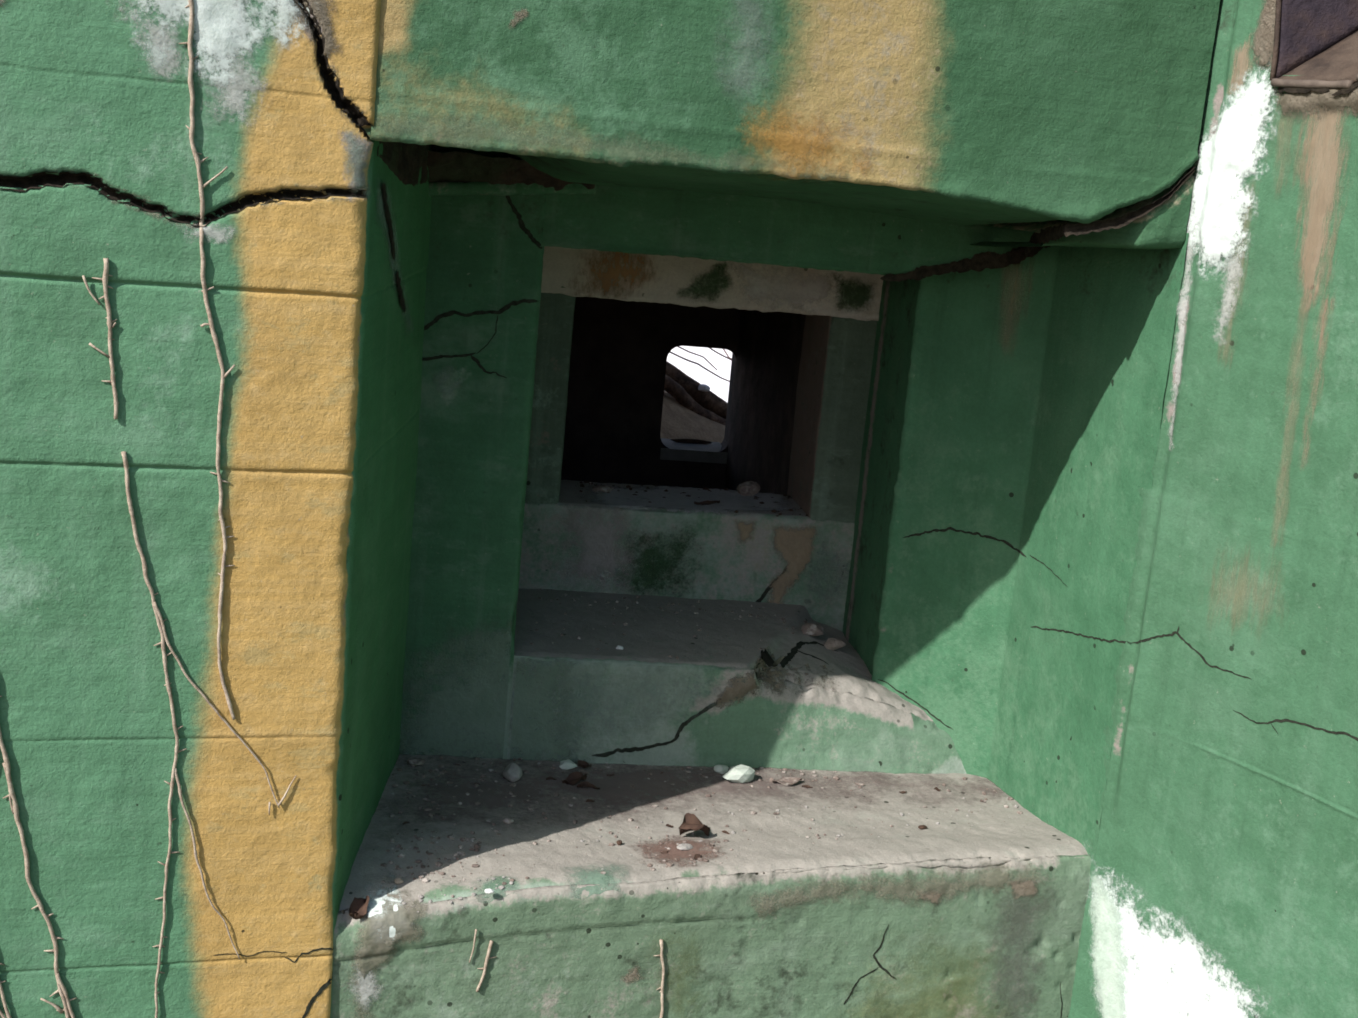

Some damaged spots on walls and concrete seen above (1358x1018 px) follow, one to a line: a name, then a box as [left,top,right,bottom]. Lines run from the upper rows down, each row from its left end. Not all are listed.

leakage [121,0,340,120]
crack [294,0,373,139]
crack [0,171,368,227]
crack [880,166,1196,282]
leakage [1169,61,1291,448]
corrosion [1298,104,1344,349]
leakage [564,486,792,586]
crack [1032,626,1252,680]
crack [592,698,721,757]
crack [1233,710,1358,741]
crack [215,948,333,1018]
leakage [1091,872,1255,1018]